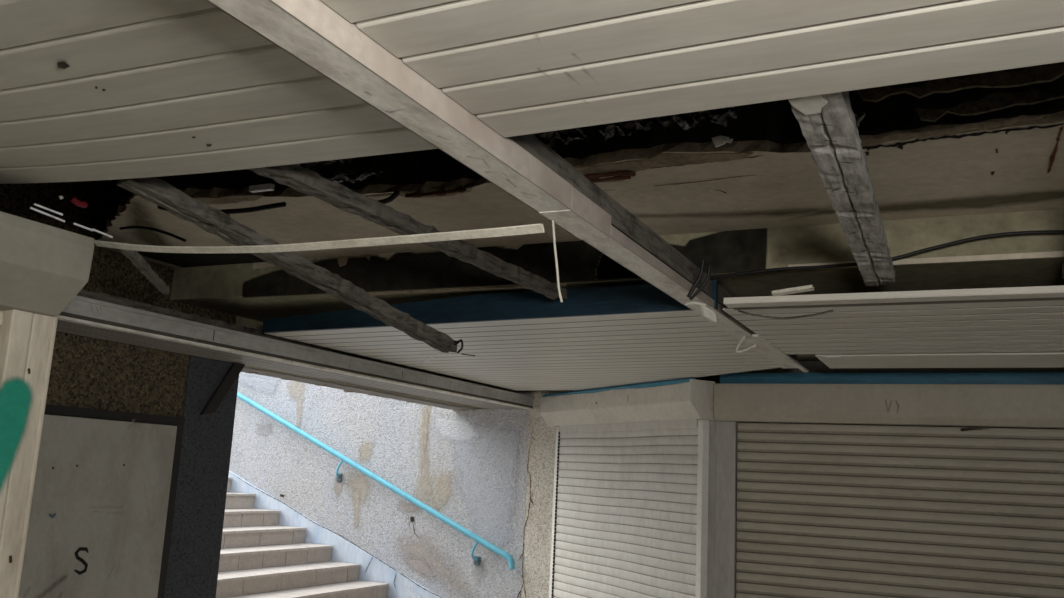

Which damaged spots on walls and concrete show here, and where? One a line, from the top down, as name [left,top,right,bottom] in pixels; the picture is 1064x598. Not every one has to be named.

corrosion [1048,127,1063,173]
crack [236,476,441,598]
crack [517,420,535,598]